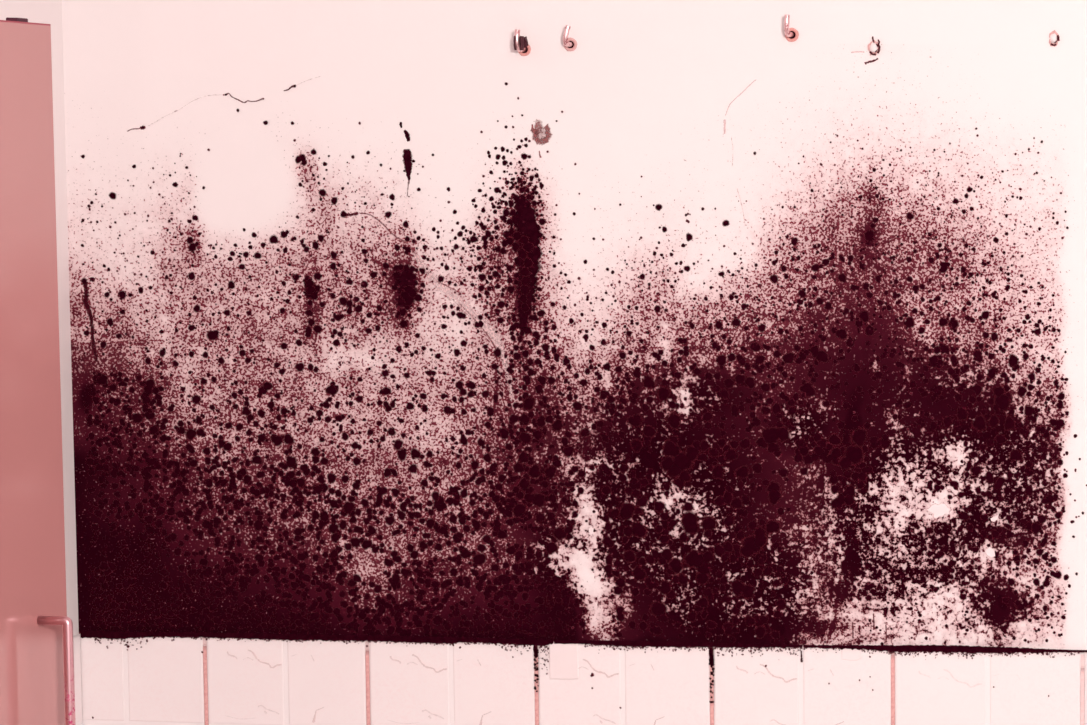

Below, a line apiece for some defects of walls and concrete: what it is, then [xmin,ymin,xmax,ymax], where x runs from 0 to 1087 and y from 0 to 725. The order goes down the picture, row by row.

crack [223,85,294,103]
damp [68,106,1084,662]